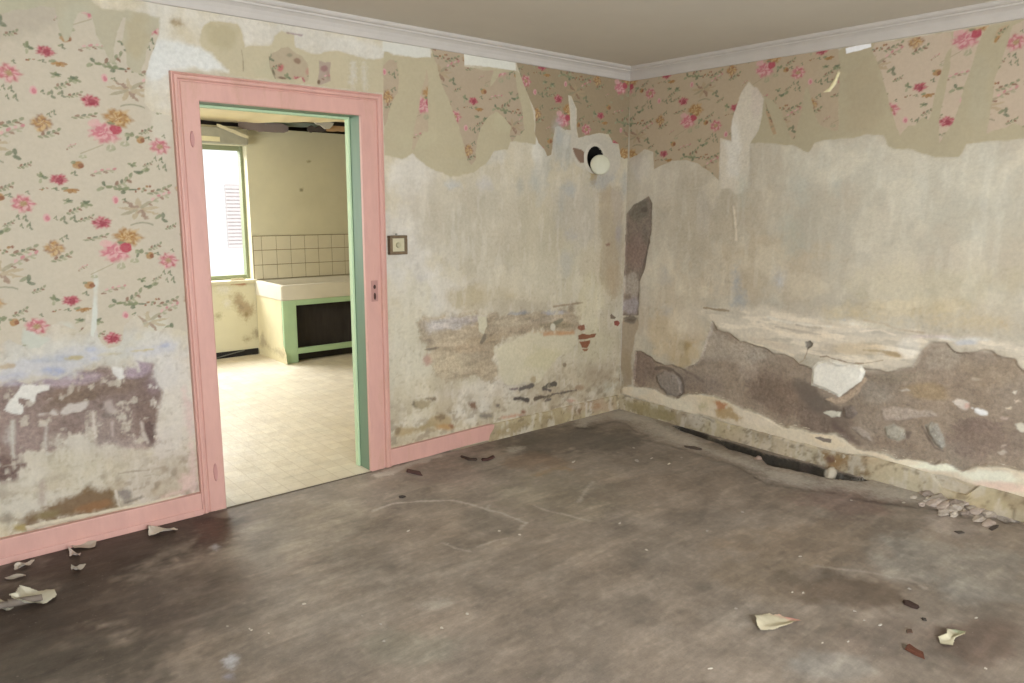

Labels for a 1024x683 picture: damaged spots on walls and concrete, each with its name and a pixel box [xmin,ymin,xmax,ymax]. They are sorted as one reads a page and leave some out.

flaking render [381,41,432,59]
flaking render [845,43,872,54]
flaking render [465,54,517,71]
peeling [822,70,841,93]
flaking render [718,80,765,191]
peeling [572,147,585,164]
spalling [414,301,597,404]
spalling [610,271,1024,471]
spalling [0,359,167,487]